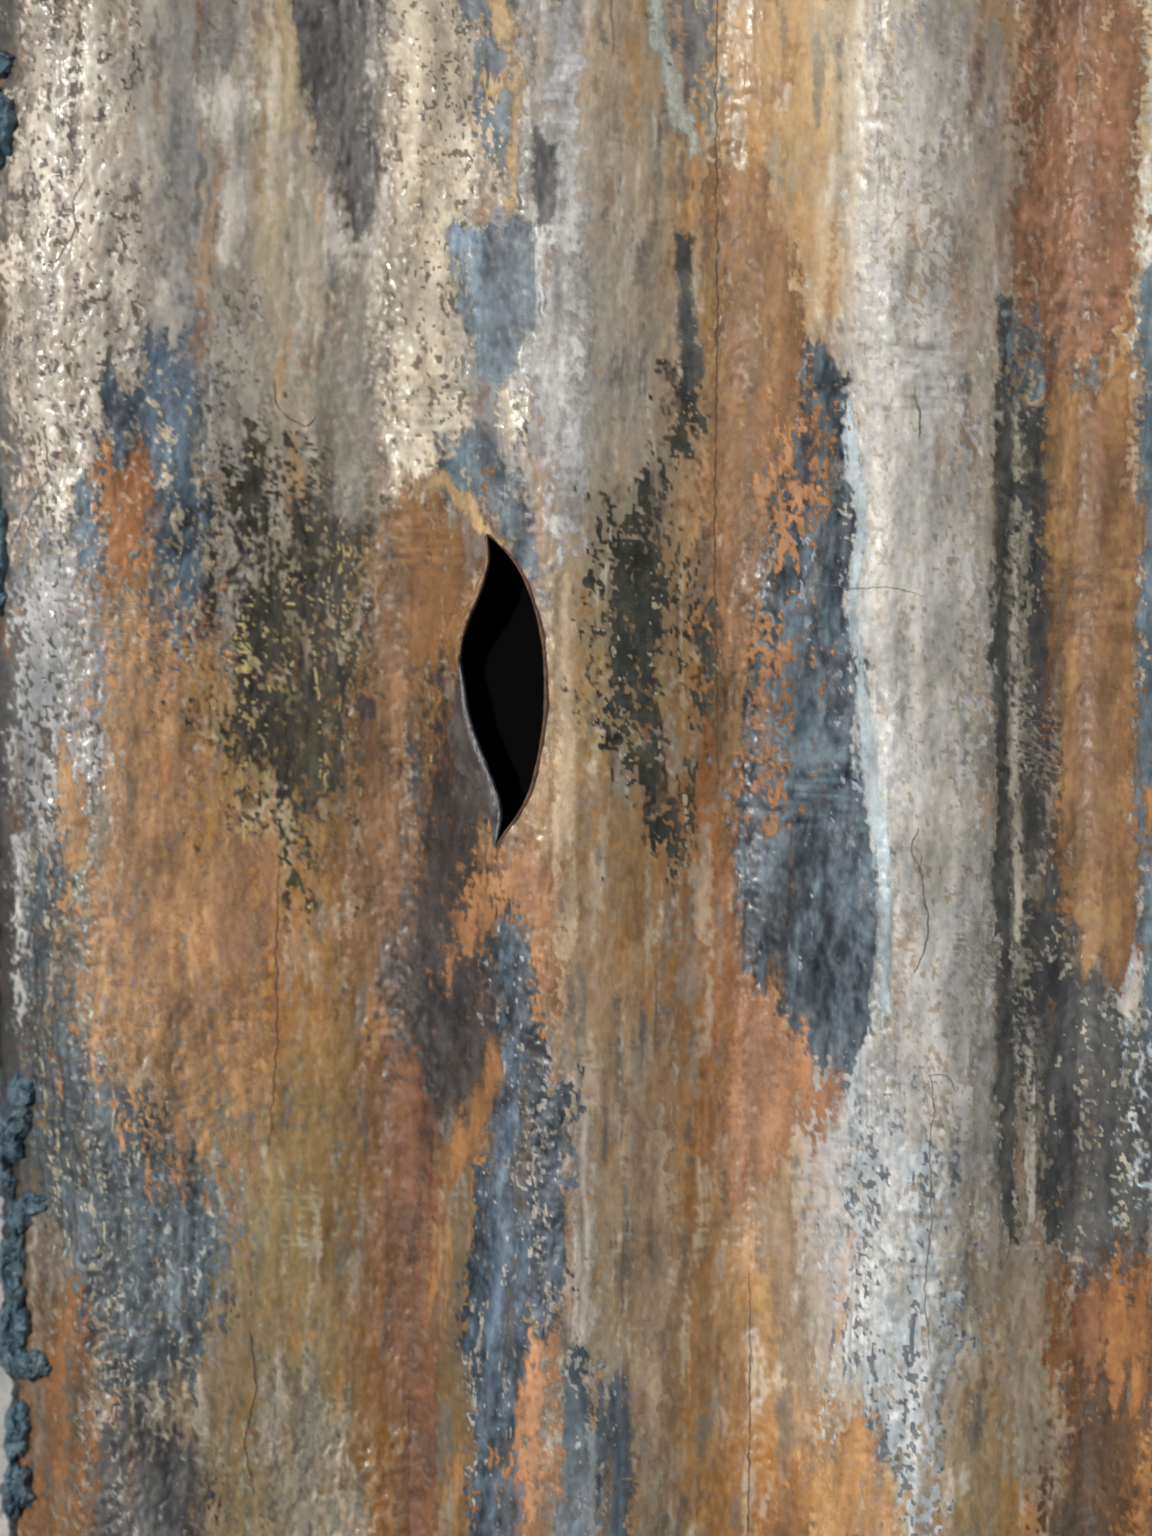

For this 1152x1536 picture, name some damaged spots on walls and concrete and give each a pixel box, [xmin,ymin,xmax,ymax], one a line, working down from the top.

corrosion [685,140,850,867]
corrosion [1004,0,1152,997]
corrosion [38,436,506,1225]
corrosion [713,978,843,1211]
corrosion [21,1270,110,1536]
corrosion [762,1391,938,1536]
corrosion [1027,1231,1152,1536]